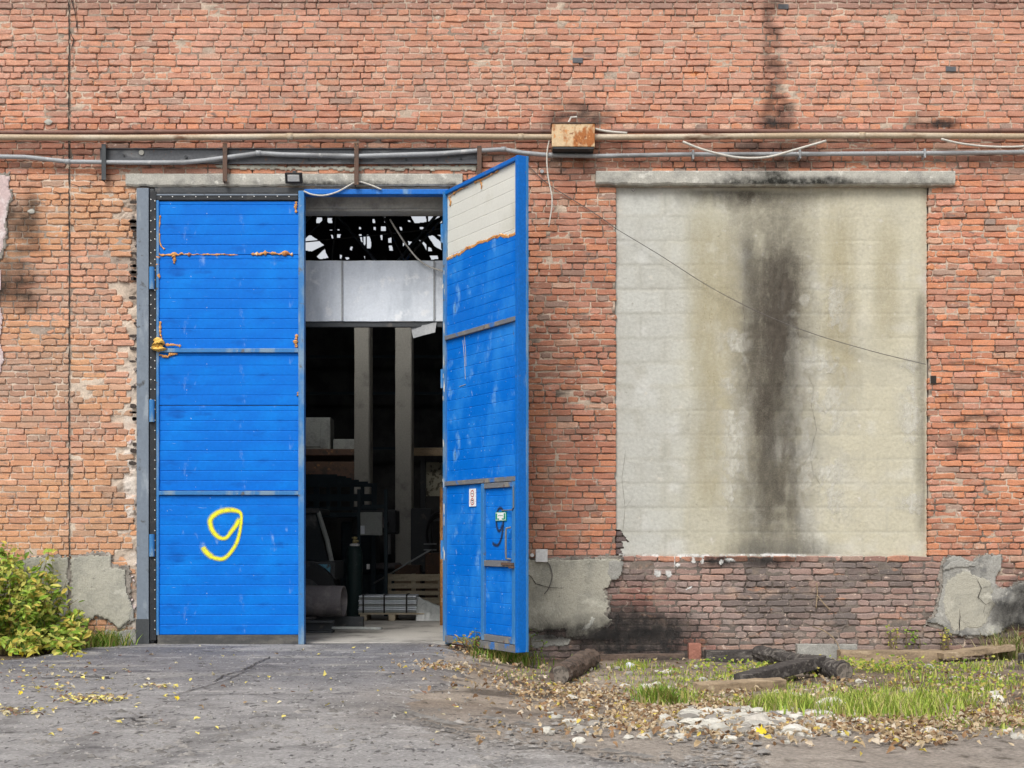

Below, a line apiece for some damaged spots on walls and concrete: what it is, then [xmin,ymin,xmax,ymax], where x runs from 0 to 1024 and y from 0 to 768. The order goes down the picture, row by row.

flaking render [0,171,14,290]
spalling [128,200,137,280]
spalling [129,319,137,388]
water stain [745,246,801,528]
flaking render [0,551,137,645]
flaking render [529,531,627,648]
flaking render [923,553,1024,639]